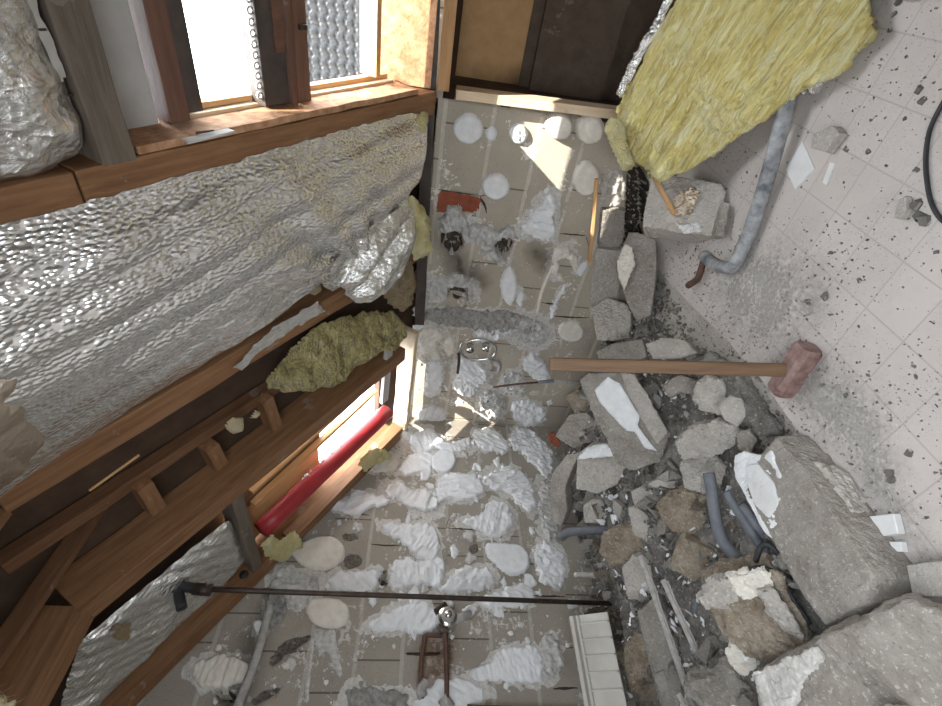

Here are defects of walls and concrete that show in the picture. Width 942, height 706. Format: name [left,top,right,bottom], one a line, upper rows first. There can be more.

spalling [436,190,482,216]
spalling [600,165,649,241]
spalling [441,231,466,255]
spalling [495,238,515,253]
spalling [448,277,473,308]
peeling [431,375,481,414]
peeling [461,440,482,471]
peeling [432,513,481,579]
peeling [398,584,425,604]
peeling [443,589,478,615]
peeling [519,573,542,596]